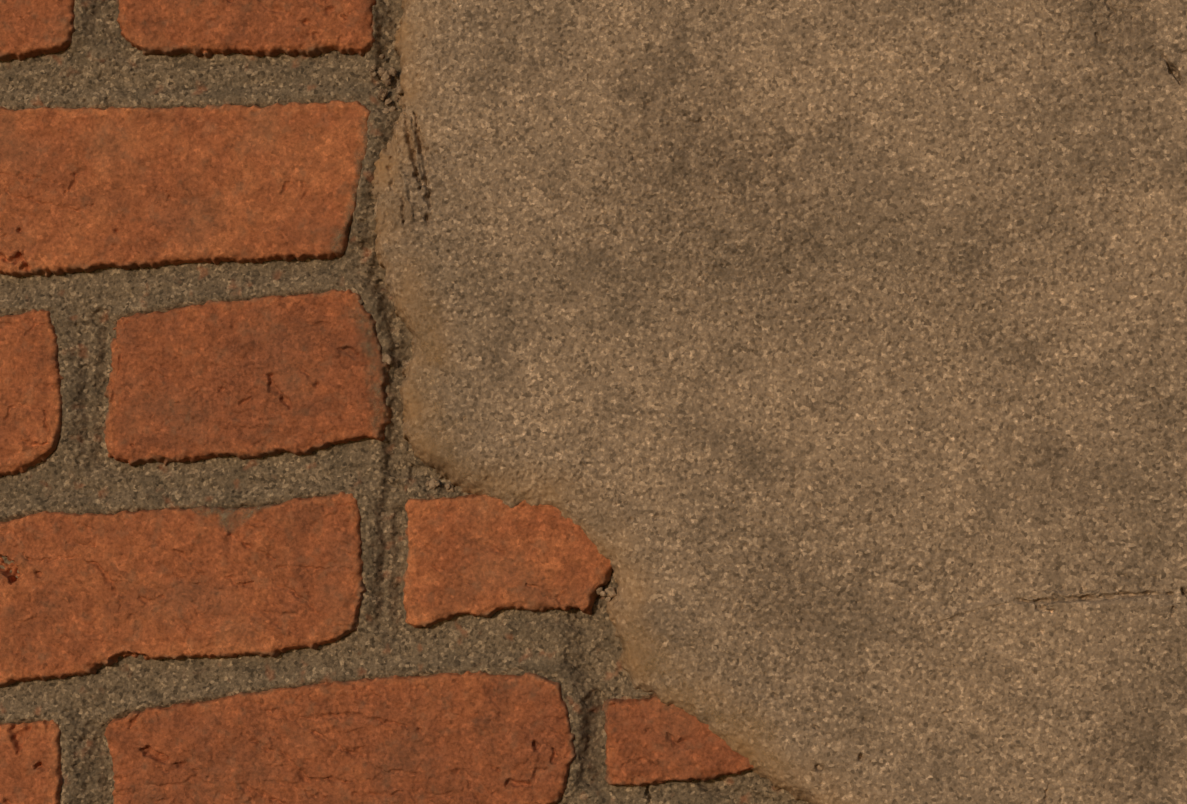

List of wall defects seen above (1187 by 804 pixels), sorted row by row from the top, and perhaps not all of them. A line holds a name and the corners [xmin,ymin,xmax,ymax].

spalling [369,54,404,125]
spalling [0,227,45,277]
spalling [382,354,409,377]
hole [238,373,293,410]
hole [0,552,52,585]
spalling [596,586,617,602]
crack [928,572,1187,627]
peeling [107,651,157,665]
peeling [7,719,56,757]
hole [138,745,198,773]
hole [487,740,559,789]